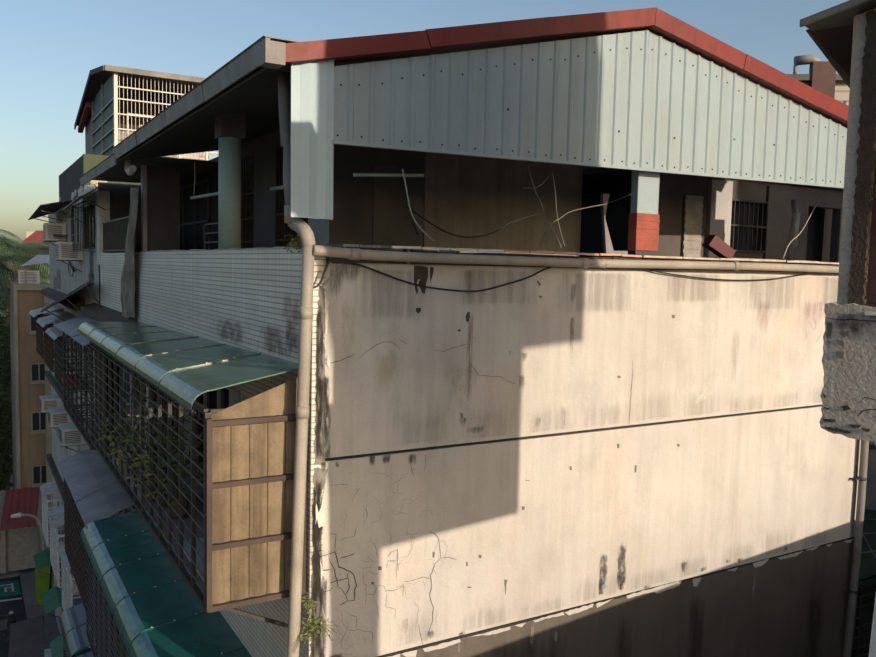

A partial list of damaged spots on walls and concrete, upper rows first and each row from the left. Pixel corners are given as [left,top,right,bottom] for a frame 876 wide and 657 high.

peeling [59,180,107,215]
crack [806,317,876,339]
crack [434,335,515,393]
spalling [822,393,870,434]
peeling [310,285,330,657]
crack [306,455,456,655]
peeling [626,581,682,599]
peeling [471,598,614,637]
peeling [389,639,461,657]